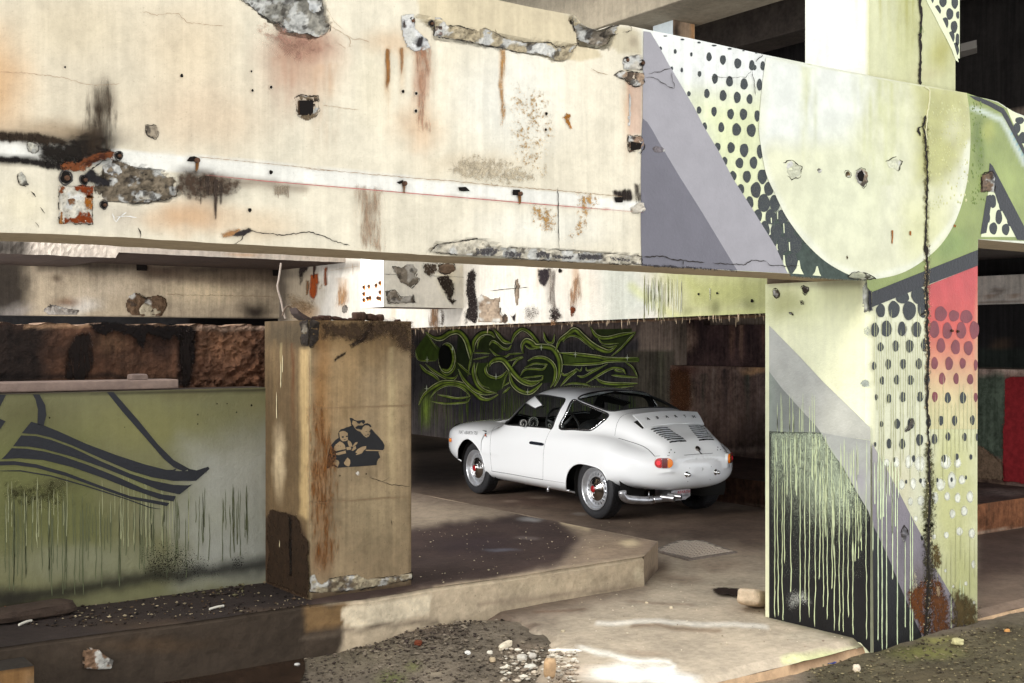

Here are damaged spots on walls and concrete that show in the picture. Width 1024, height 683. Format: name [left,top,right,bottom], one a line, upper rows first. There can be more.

spalling [241,0,331,38]
spalling [433,17,632,60]
rust [385,48,404,87]
rust [499,50,552,169]
rust [59,185,94,224]
spalling [58,159,179,225]
crack [223,228,356,271]
spalling [431,238,643,275]
flaking render [126,293,167,317]
crack [917,0,937,636]
leakage [267,509,309,597]
rust [907,573,952,633]